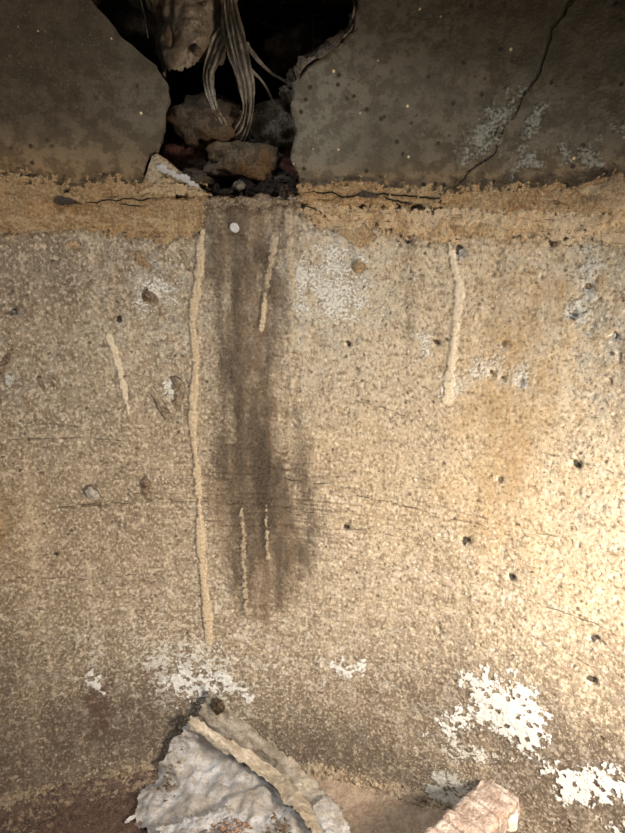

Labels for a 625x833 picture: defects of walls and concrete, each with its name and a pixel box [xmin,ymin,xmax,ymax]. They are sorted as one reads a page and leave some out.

crack [301,0,574,222]
leakage [132,206,392,712]
leakage [419,656,625,833]